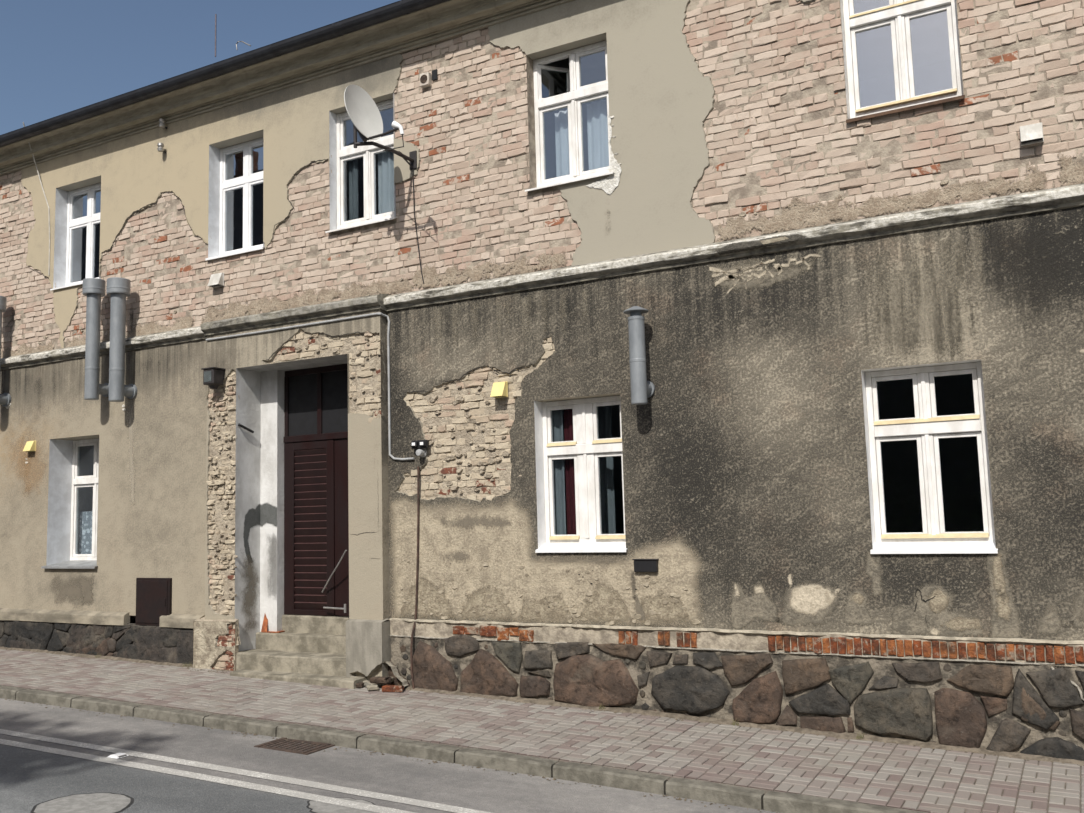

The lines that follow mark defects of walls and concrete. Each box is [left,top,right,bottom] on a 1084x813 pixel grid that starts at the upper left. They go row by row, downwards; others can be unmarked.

flaking render [682,0,1084,243]
flaking render [99,27,582,342]
flaking render [0,169,87,358]
leakage [709,254,820,293]
leakage [868,235,983,354]
flaking render [262,328,386,423]
flaking render [206,369,240,671]
flaking render [390,335,701,626]
flaking render [730,574,875,629]
flaking render [892,584,985,637]
leakage [992,554,1011,619]
flaking render [1036,601,1067,635]